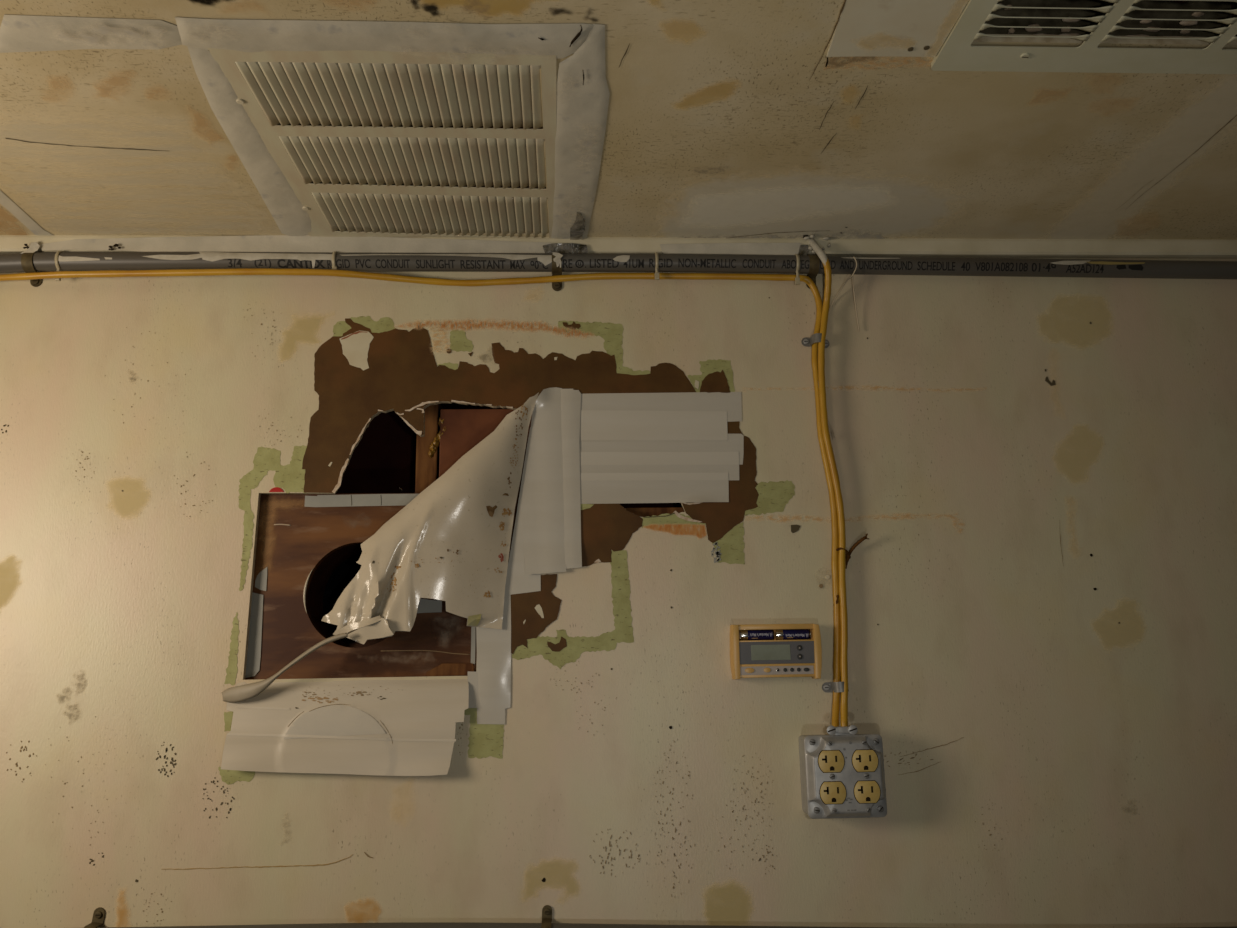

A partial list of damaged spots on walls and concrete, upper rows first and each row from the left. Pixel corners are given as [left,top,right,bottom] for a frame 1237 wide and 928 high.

water stain [411,0,533,16]
water stain [677,82,734,108]
water stain [1040,297,1110,347]
peeling [238,316,735,591]
peeling [511,421,795,669]
water stain [1094,602,1143,647]
peeling [224,613,239,685]
peeling [224,711,233,731]
peeling [464,708,504,759]
peeling [218,767,255,785]
water stain [525,861,578,897]
water stain [705,883,752,926]